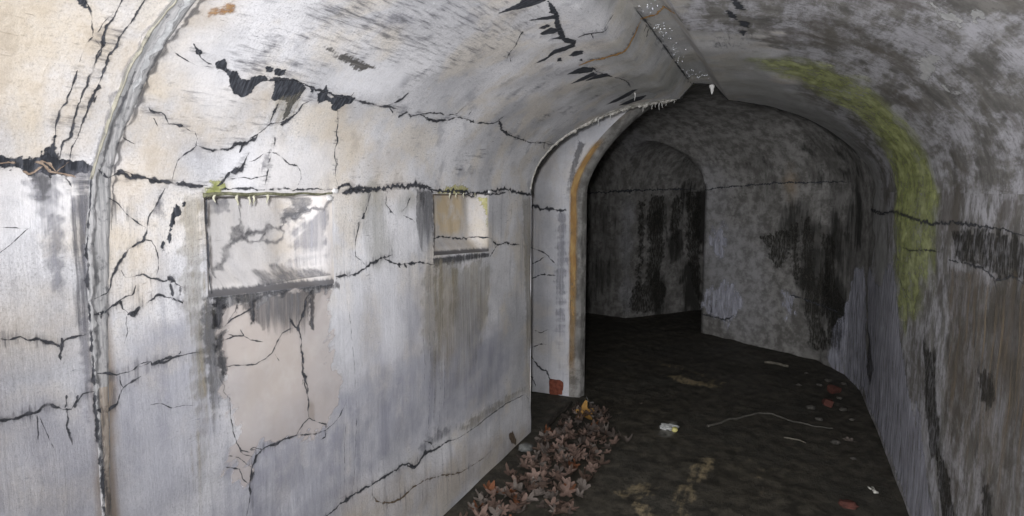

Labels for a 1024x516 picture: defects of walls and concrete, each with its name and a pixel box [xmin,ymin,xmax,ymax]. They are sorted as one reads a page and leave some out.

crack [55,0,145,187]
crack [176,43,223,68]
corrosion [208,4,235,17]
water stain [33,173,50,202]
crack [3,77,566,360]
corrosion [569,144,599,334]
water stain [629,192,702,314]
water stain [760,217,844,355]
water stain [952,227,1024,279]
crack [0,351,197,448]
crack [221,290,343,513]
crack [326,330,550,516]